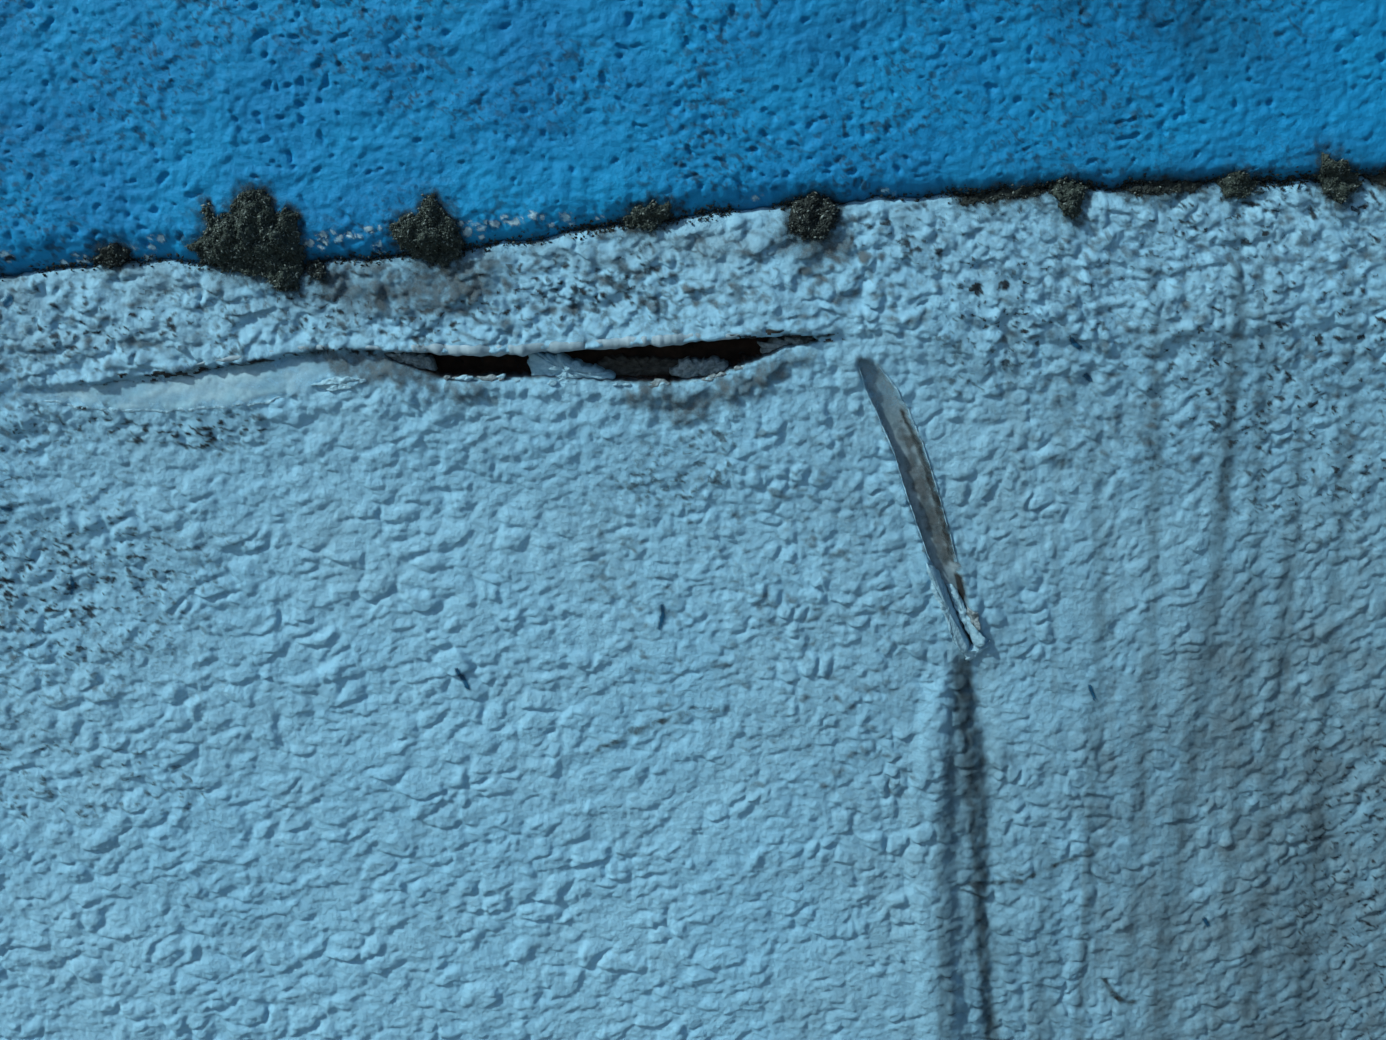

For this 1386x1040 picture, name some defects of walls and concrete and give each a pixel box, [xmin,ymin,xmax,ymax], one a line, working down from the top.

leakage [1149,186,1317,269]
leakage [1351,186,1382,215]
leakage [277,290,372,333]
crack [80,329,845,389]
leakage [394,244,665,342]
leakage [850,205,1070,369]
leakage [1143,306,1237,368]
leakage [1166,260,1386,519]
spalling [859,359,991,661]
leakage [957,660,993,1040]